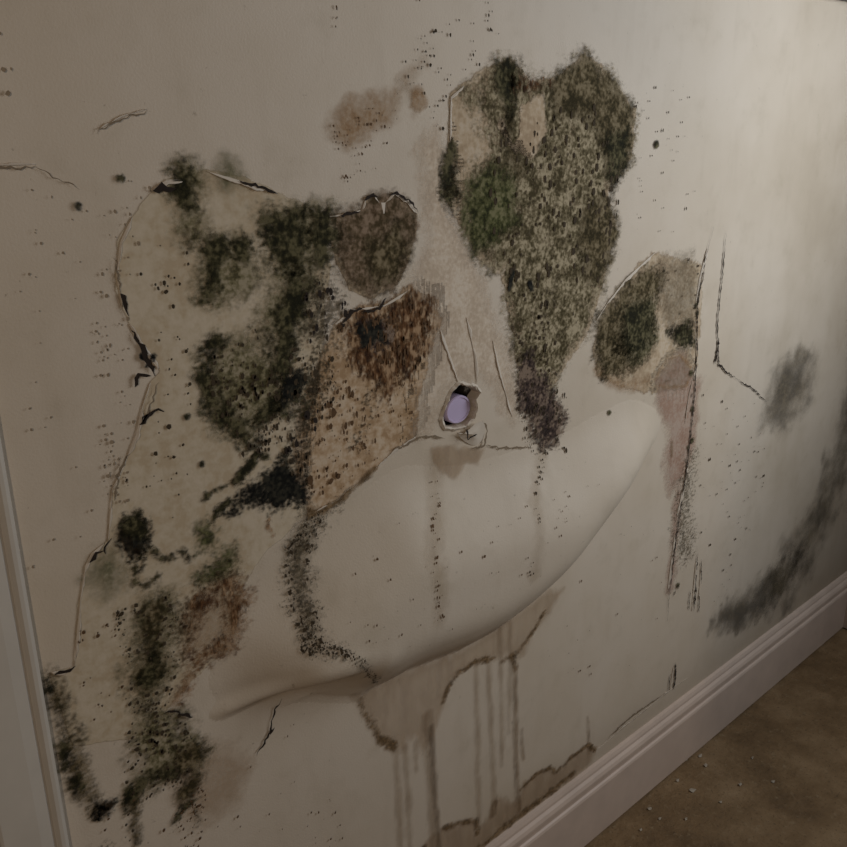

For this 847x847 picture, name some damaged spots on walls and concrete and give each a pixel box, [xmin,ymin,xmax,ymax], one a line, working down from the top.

crack [0,162,77,188]
damp [43,156,436,847]
crack [257,699,282,753]
peeling [50,56,703,746]
damp [442,610,546,704]
damp [443,743,596,847]
damp [439,40,706,592]
crack [667,236,765,620]